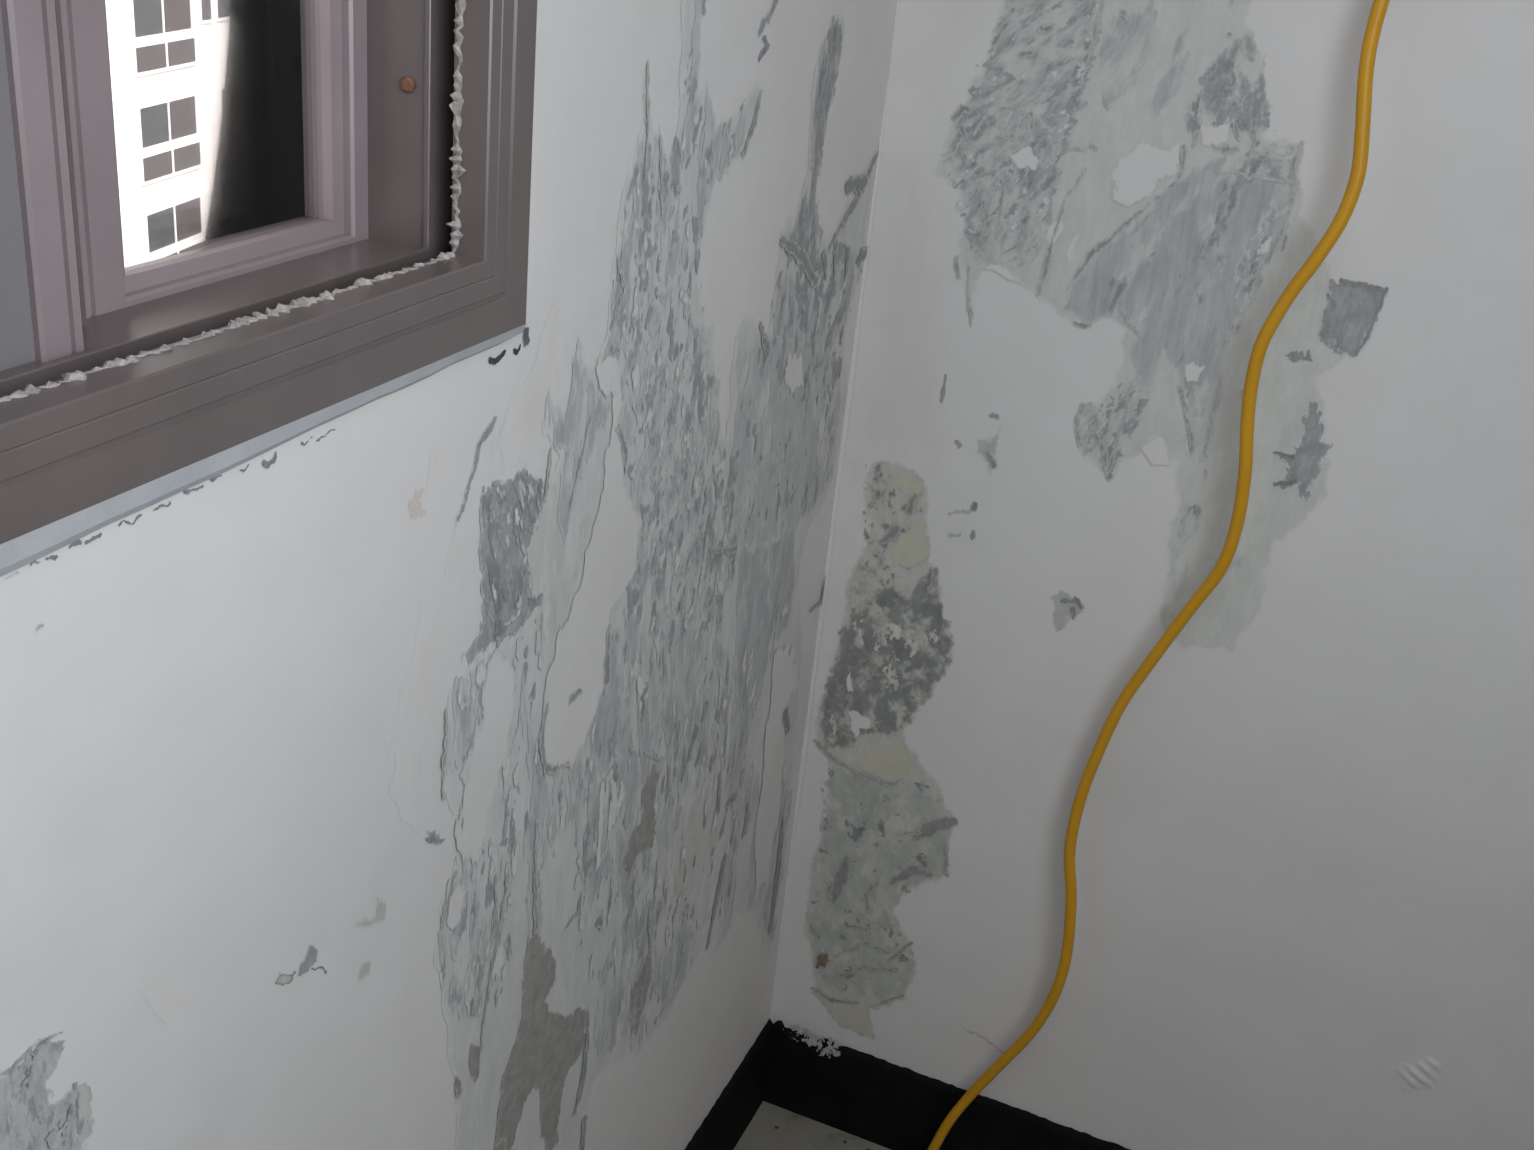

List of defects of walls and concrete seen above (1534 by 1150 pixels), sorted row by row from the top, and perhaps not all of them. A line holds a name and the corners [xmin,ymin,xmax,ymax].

peeling [425,0,880,1150]
peeling [934,0,1389,654]
peeling [0,1032,95,1150]
peeling [275,944,327,986]